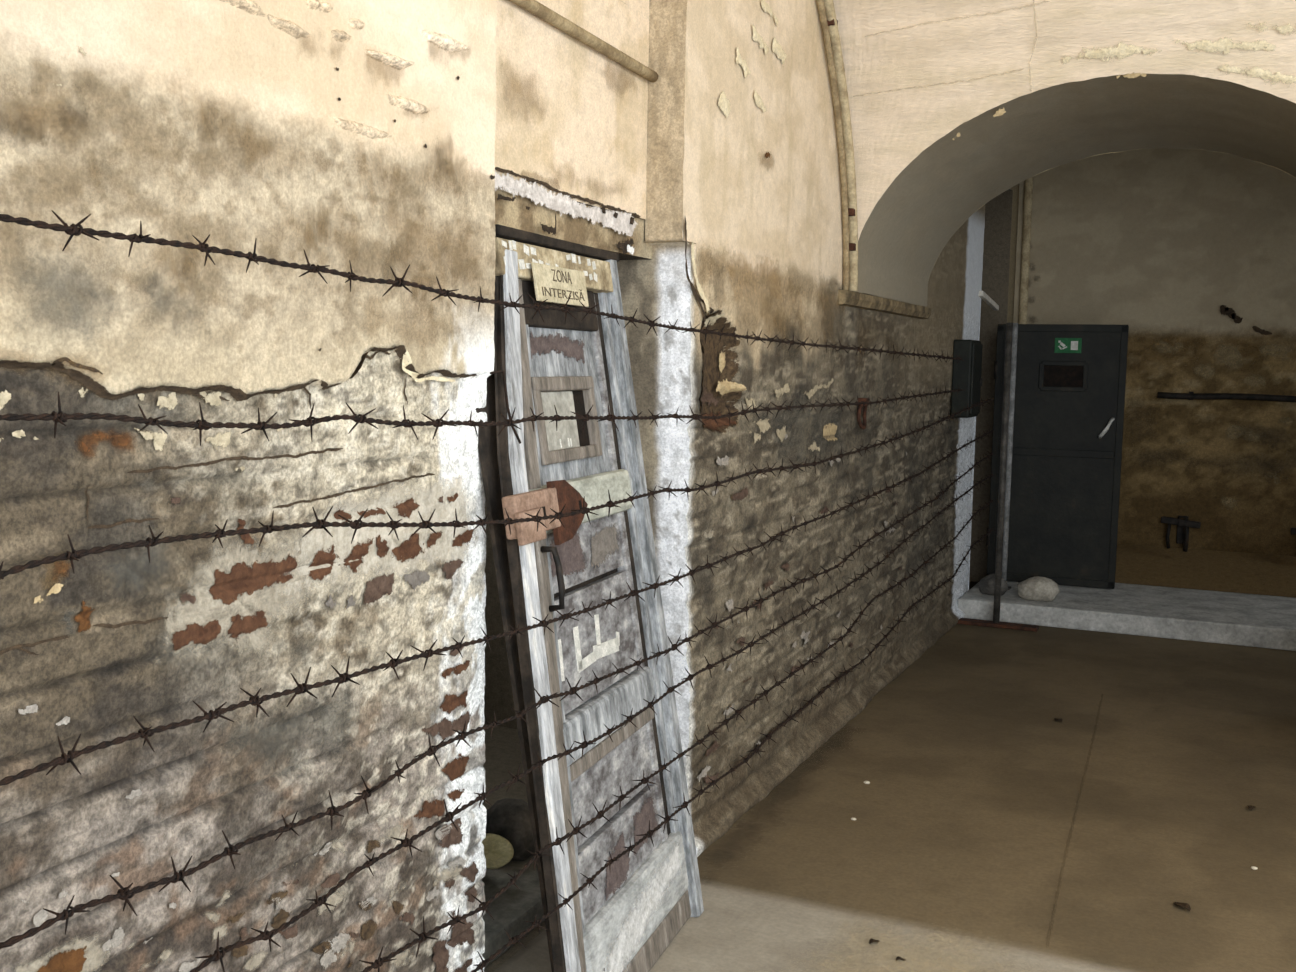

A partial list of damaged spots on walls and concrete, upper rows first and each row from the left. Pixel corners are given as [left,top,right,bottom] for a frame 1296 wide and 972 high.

peeling [0,390,12,410]
peeling [134,428,168,451]
peeling [138,392,179,410]
peeling [199,391,221,406]
flaking render [699,310,794,443]
flaking render [165,478,477,656]
flaking render [422,646,472,740]
flaking render [367,753,479,903]
peeling [146,950,201,972]
peeling [206,892,266,971]
peeling [313,886,415,971]
peeling [433,911,475,972]